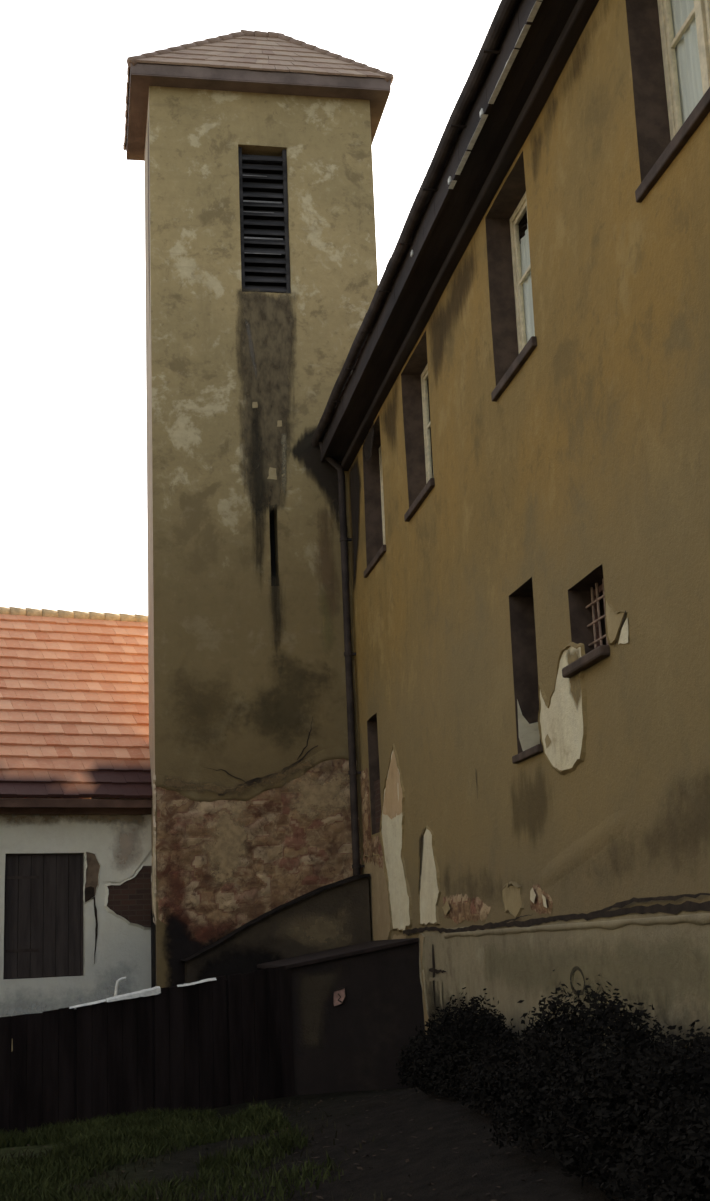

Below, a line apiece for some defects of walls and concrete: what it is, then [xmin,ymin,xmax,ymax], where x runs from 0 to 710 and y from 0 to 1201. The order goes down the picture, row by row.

leakage [252,408,265,565]
leakage [271,577,281,642]
flaking render [604,592,628,647]
crack [205,718,318,796]
flaking render [517,642,587,775]
spalling [83,743,553,1040]